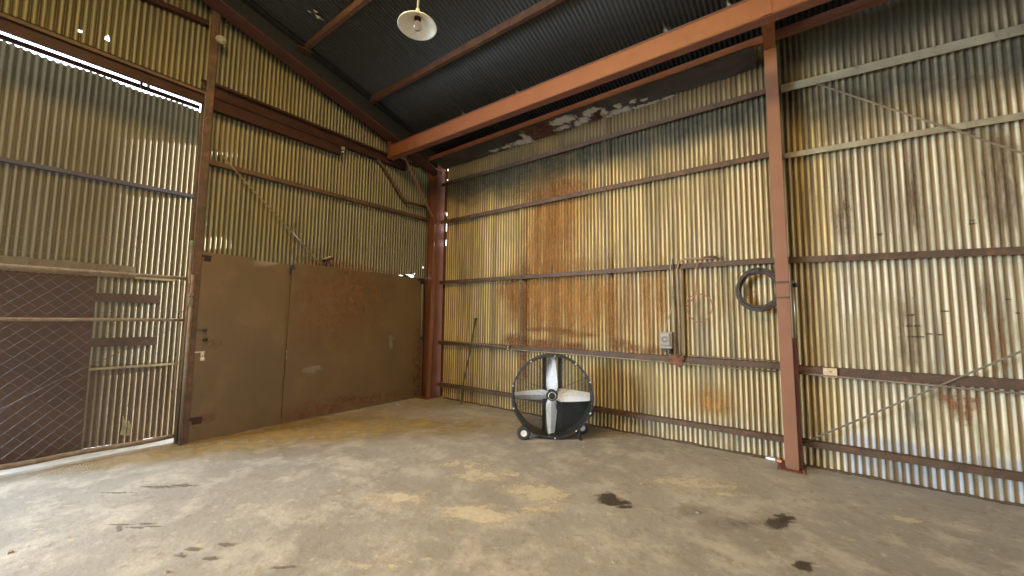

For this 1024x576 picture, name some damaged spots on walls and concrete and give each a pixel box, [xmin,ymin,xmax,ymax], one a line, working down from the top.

peeling [549,94,677,131]
peeling [489,134,535,152]